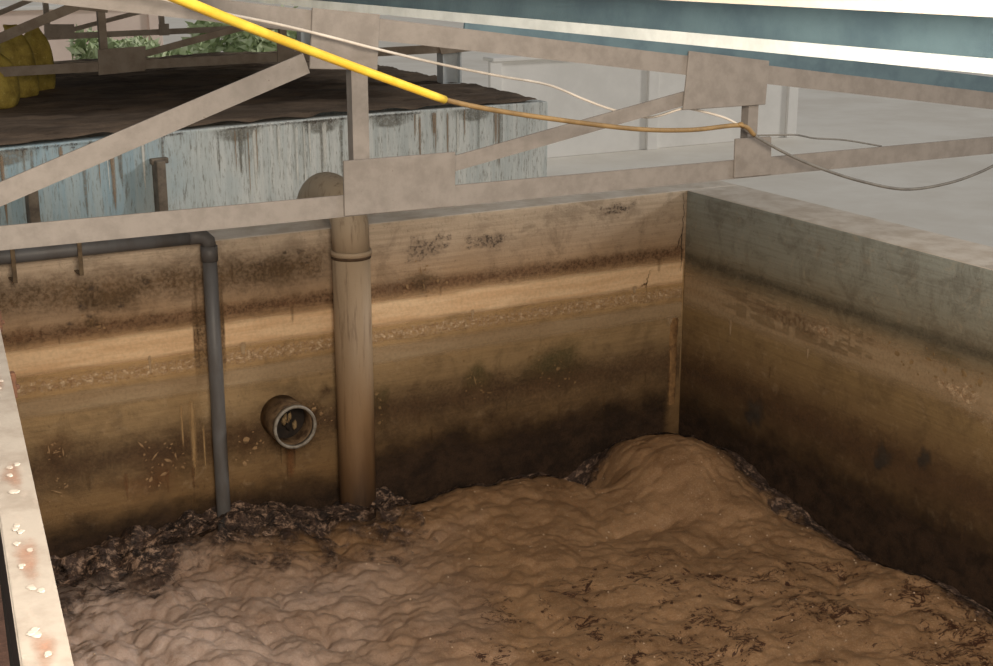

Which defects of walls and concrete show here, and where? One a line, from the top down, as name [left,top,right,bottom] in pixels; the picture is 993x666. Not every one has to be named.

damp [218,125,261,191]
damp [275,117,345,181]
damp [0,268,213,486]
damp [220,293,336,385]
damp [371,247,993,426]
corrosion [6,462,20,494]
corrosion [12,523,33,569]
damp [375,391,666,511]
damp [679,398,993,612]
corrosion [26,627,52,658]